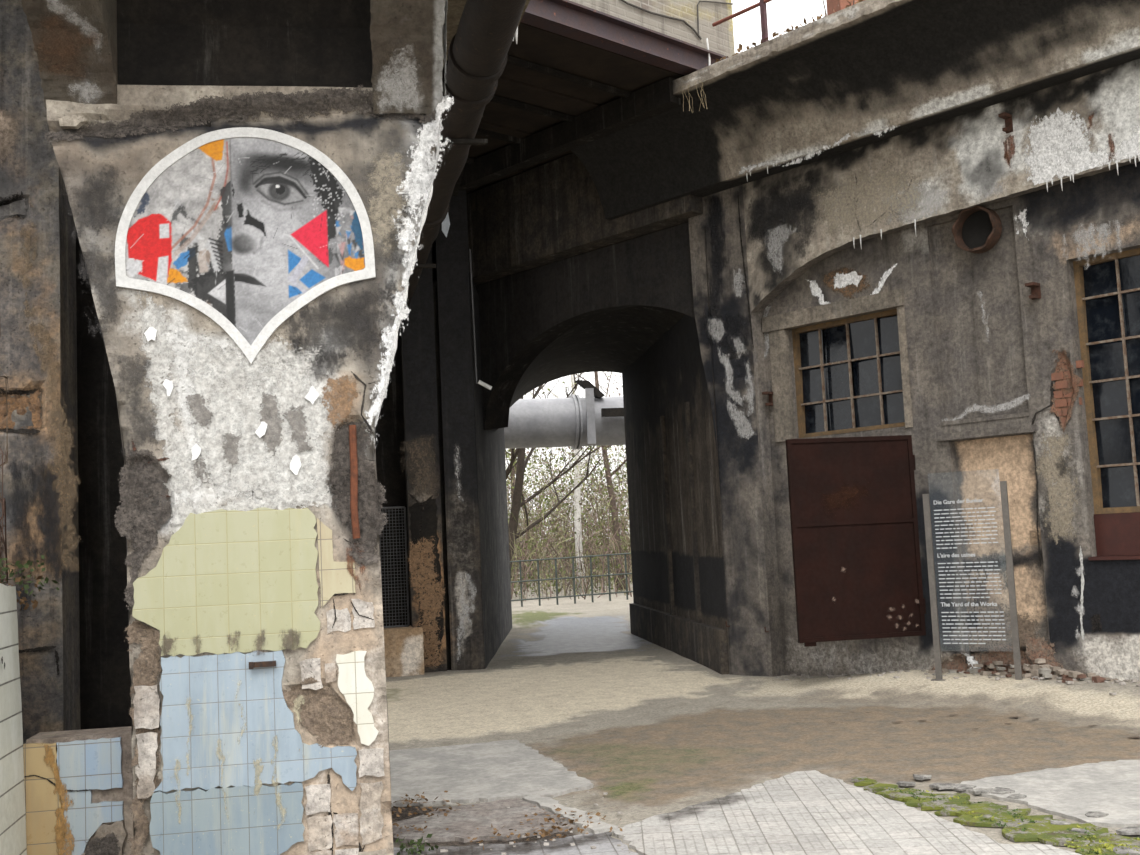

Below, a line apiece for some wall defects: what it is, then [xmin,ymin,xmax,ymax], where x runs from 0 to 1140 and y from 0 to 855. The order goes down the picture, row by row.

water stain [739,126,897,174]
water stain [1023,107,1140,185]
flaking render [369,153,408,253]
water stain [1014,209,1029,240]
flaking render [401,435,439,497]
flaking render [1036,349,1084,545]
peeling [85,289,389,855]
flaking render [407,536,446,669]